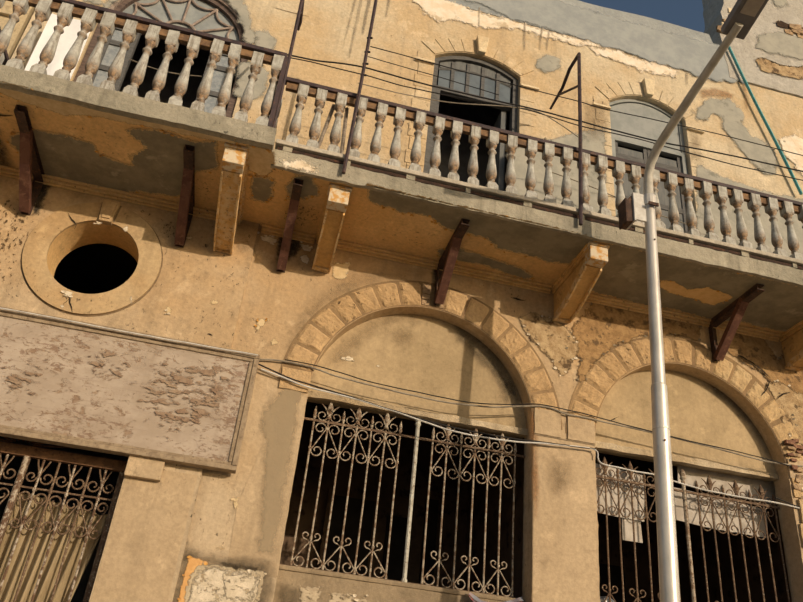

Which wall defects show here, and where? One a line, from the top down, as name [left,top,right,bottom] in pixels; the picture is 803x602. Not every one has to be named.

peeling [413,0,679,79]
flaking render [756,57,803,80]
spalling [775,19,803,39]
peeling [32,128,220,198]
peeling [247,146,322,226]
corrosion [277,147,645,234]
corrosion [657,234,803,270]
flaking render [518,244,649,384]
peeling [658,255,803,499]
crack [737,354,790,399]
peeling [178,556,208,602]